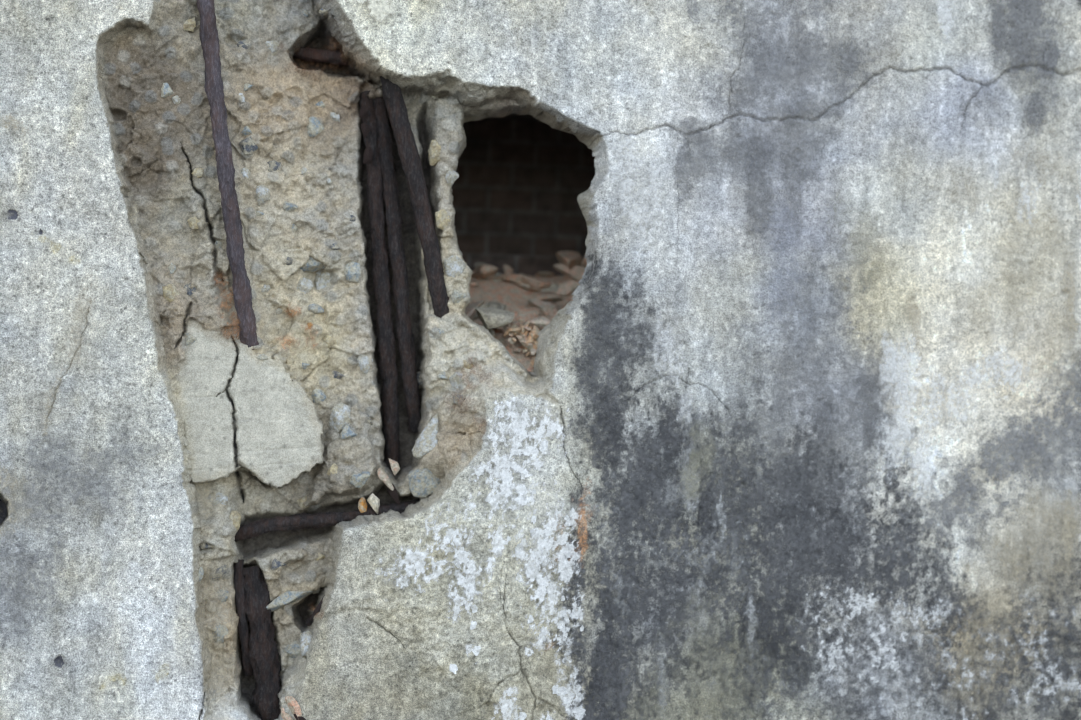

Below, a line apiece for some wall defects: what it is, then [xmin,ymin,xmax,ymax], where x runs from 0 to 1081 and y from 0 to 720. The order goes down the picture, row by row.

crack [184,153,224,282]
water stain [670,0,873,255]
water stain [975,0,1061,130]
crack [226,338,257,503]
spalling [95,0,586,720]
water stain [545,248,1081,720]